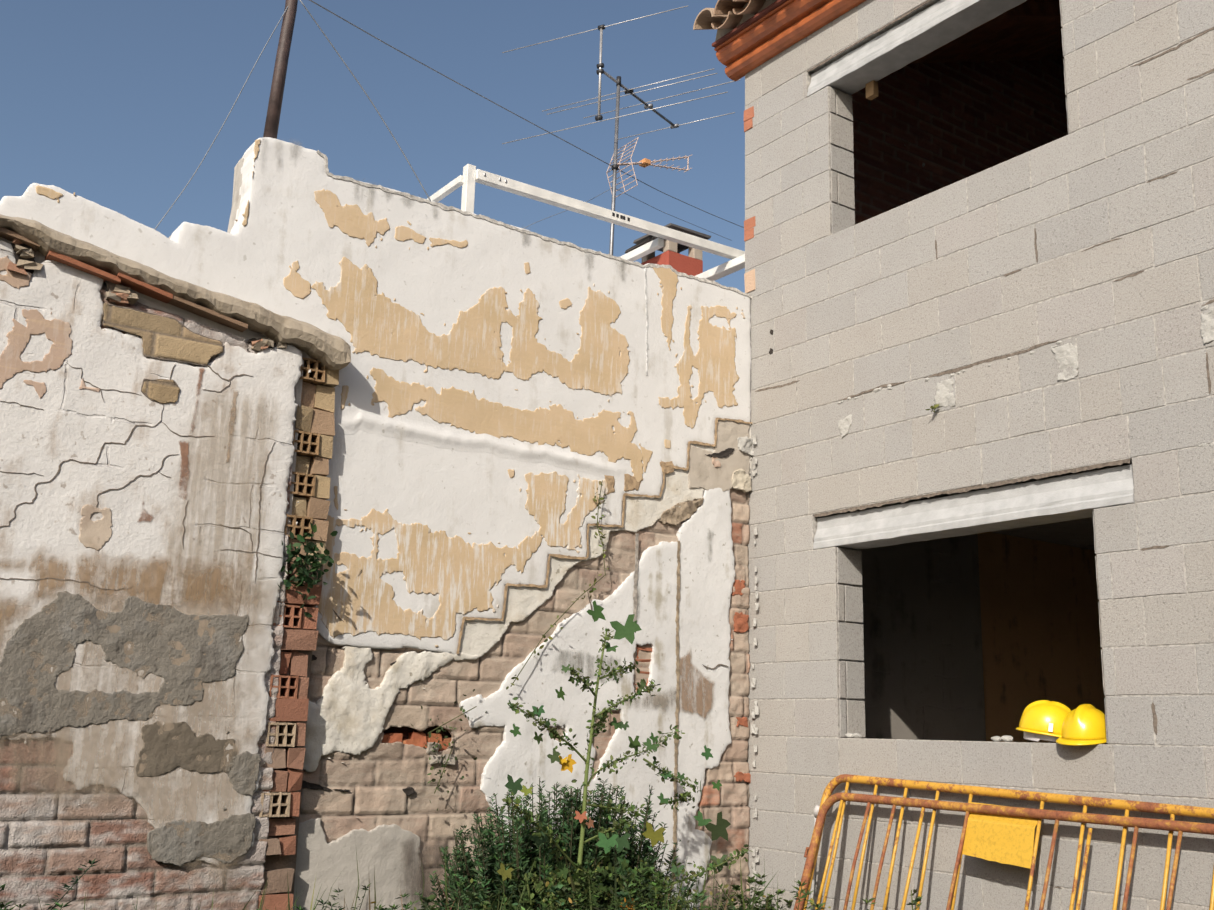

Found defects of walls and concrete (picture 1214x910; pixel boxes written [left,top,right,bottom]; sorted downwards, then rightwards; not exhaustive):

peeling [314,189,468,250]
peeling [0,309,73,398]
crack [0,578,133,590]
crack [0,362,206,527]
flaking render [102,303,224,366]
crack [203,364,250,392]
crack [220,444,283,578]
peeling [283,257,671,483]
peeling [653,267,745,428]
water stain [28,555,258,831]
flaking render [299,469,684,908]
flaking render [695,489,751,910]